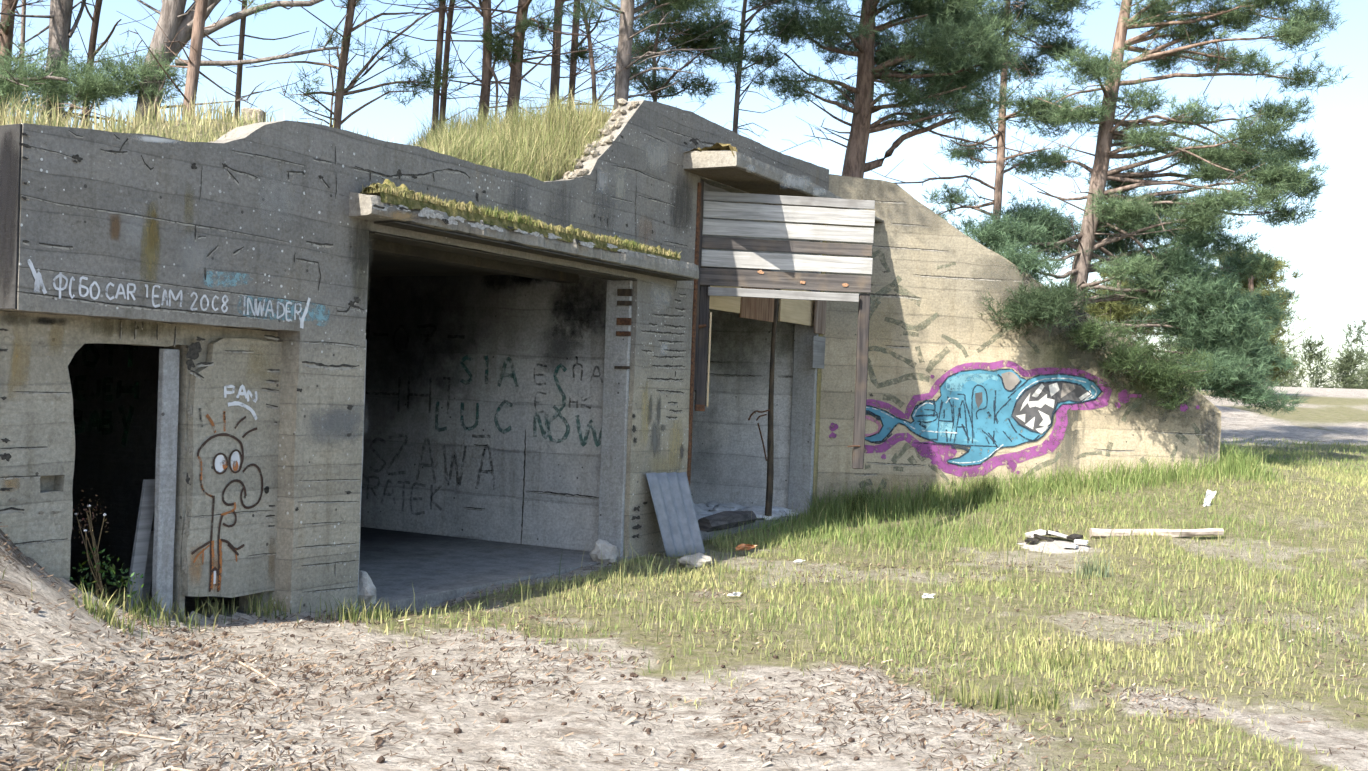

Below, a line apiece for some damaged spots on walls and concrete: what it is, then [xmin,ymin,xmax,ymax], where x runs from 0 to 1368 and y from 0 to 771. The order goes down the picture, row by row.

crack [12,146,471,425]